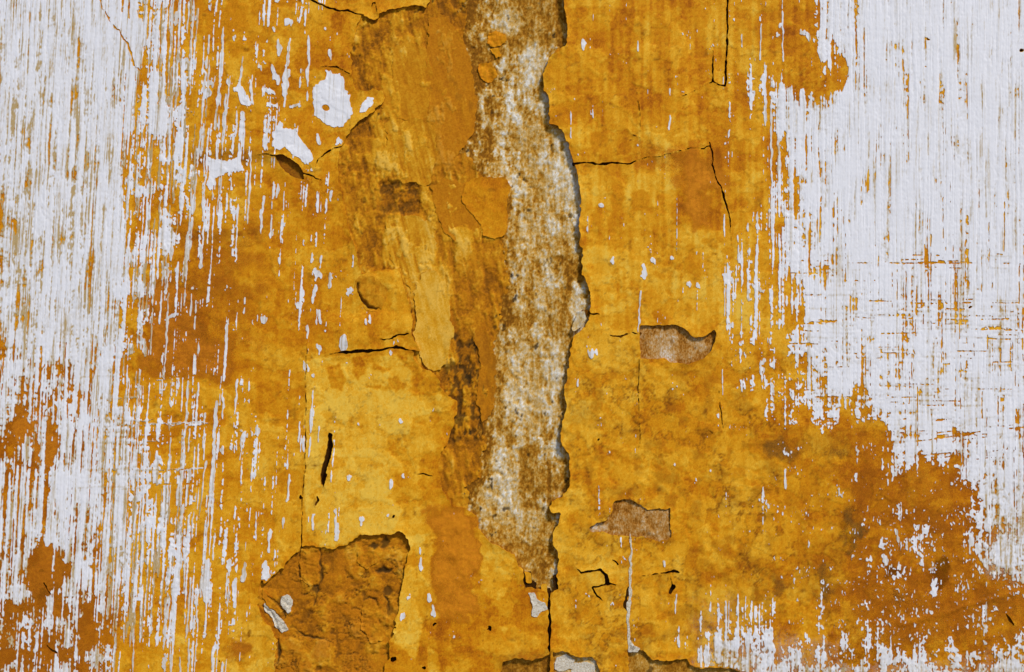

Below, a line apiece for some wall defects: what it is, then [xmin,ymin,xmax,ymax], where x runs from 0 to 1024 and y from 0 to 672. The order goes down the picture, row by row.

crack [710,0,728,87]
crack [572,135,659,166]
crack [688,142,731,227]
peeling [0,0,410,672]
crack [334,333,409,354]
flaking render [338,0,591,617]
peeling [628,0,1024,672]
crack [301,350,333,505]
flaking render [590,499,671,541]
crack [578,537,679,652]